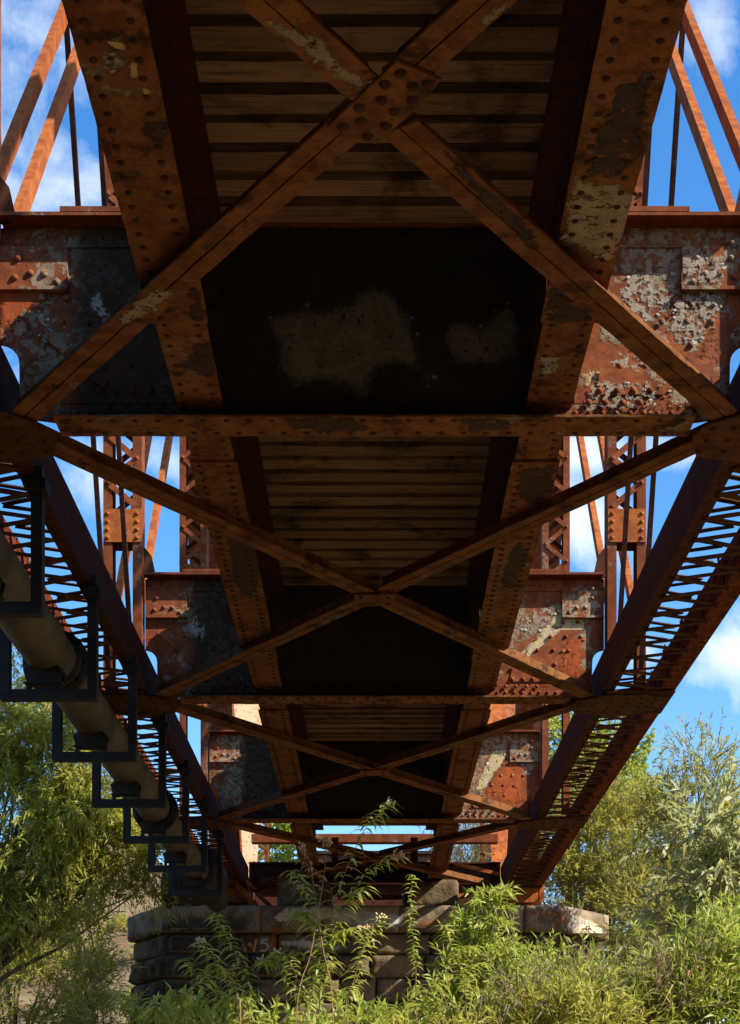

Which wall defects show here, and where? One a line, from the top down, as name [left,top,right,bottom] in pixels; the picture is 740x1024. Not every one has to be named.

peeling [265,20,374,92]
corrosion [586,72,652,178]
peeling [89,287,173,323]
peeling [618,252,727,344]
peeling [599,327,649,368]
peeling [581,370,690,411]
peeling [188,614,205,641]
peeling [520,604,585,656]
peeling [476,750,506,792]